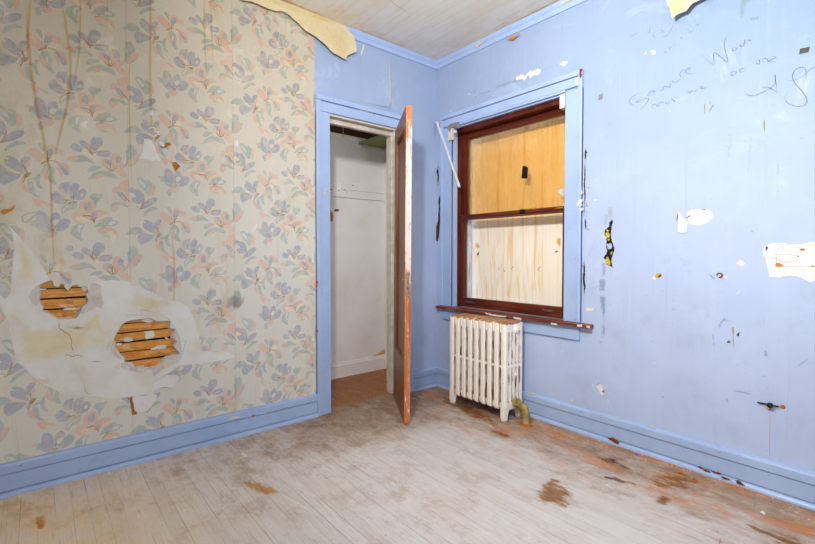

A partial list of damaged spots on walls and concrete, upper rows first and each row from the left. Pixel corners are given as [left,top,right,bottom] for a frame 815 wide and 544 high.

peeling [677,209,712,233]
peeling [763,242,815,282]
flaking render [36,280,88,320]
flaking render [107,310,186,376]